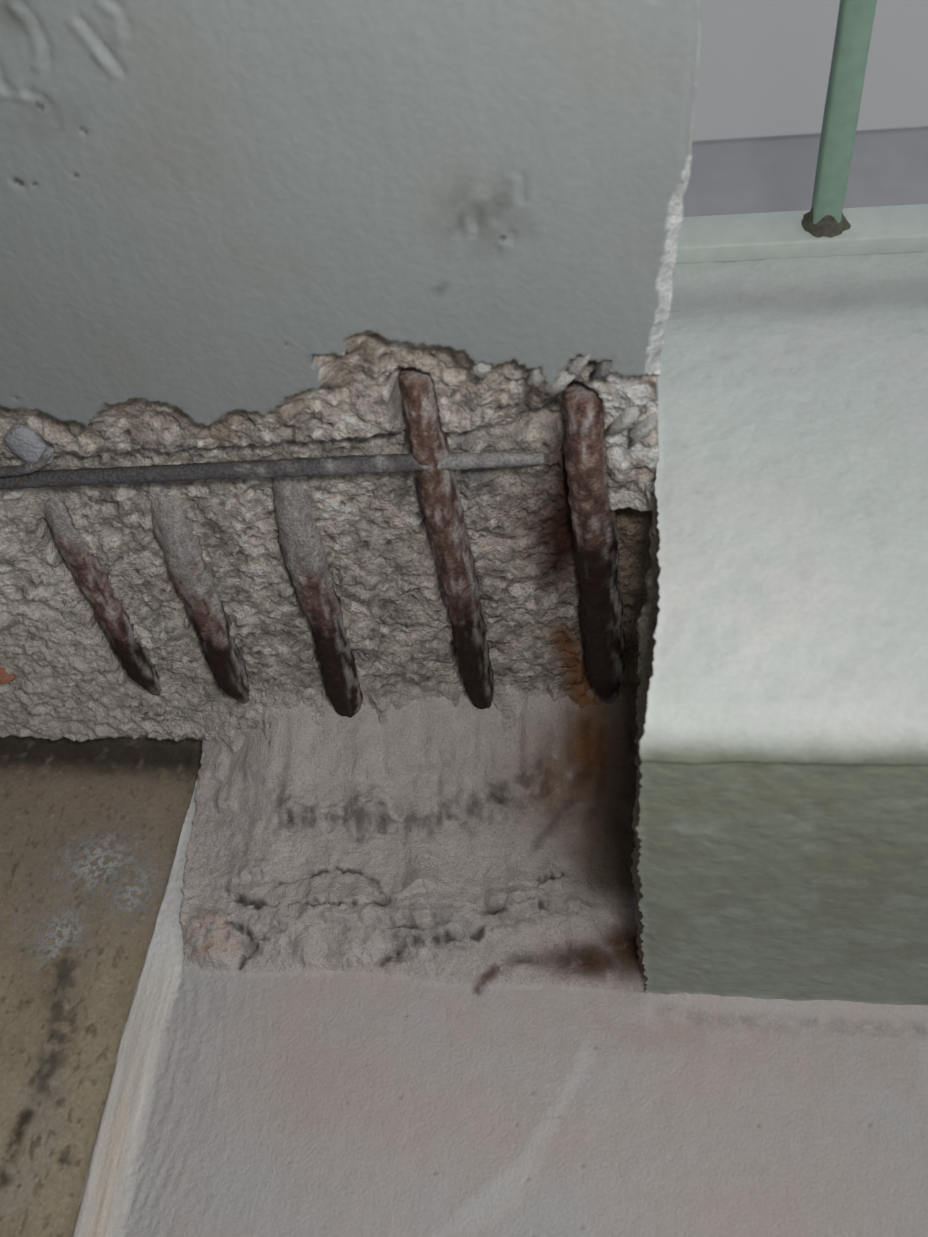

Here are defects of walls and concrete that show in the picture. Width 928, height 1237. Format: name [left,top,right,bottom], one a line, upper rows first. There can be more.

corrosion [544,456,576,565]
spalling [0,155,692,994]
corrosion [556,631,604,779]
efflorescence [62,836,153,913]
water stain [39,912,82,982]
crack [237,883,282,970]
corrosion [476,968,499,991]
corrosion [555,930,639,975]
water stain [15,1111,33,1142]